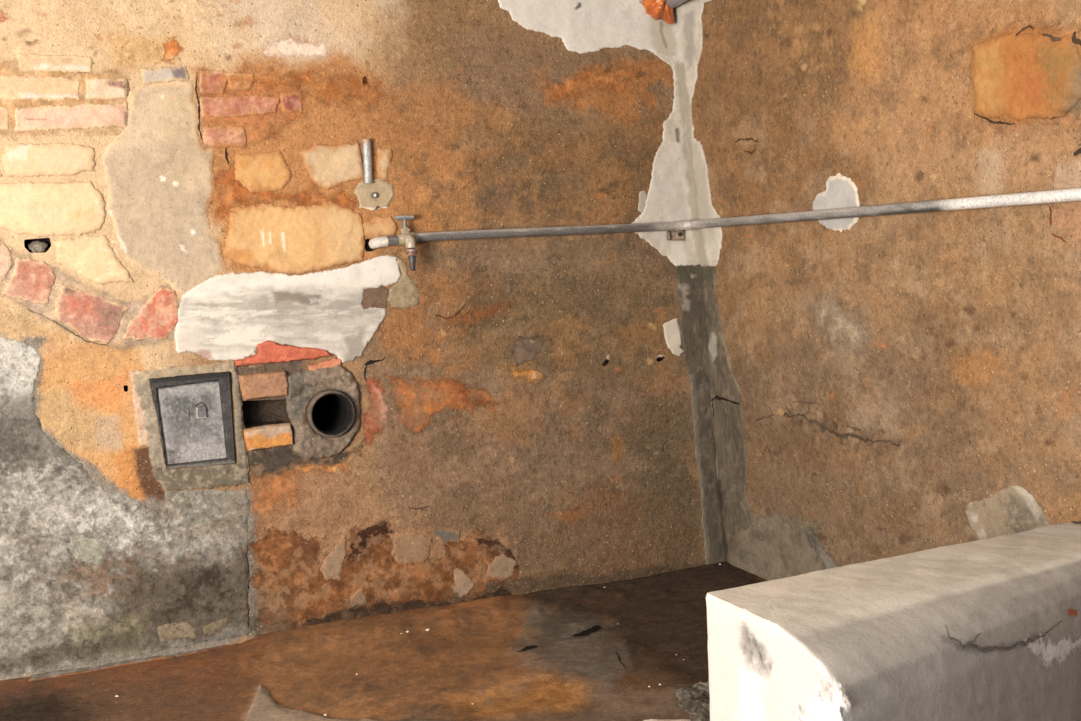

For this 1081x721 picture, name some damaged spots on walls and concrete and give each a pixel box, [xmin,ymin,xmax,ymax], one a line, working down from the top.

flaking render [0,37,401,371]
peeling [498,0,837,581]
rust [363,376,499,445]
crack [711,395,900,446]
damp [11,472,190,555]
damp [28,643,239,681]
crack [945,620,1062,653]